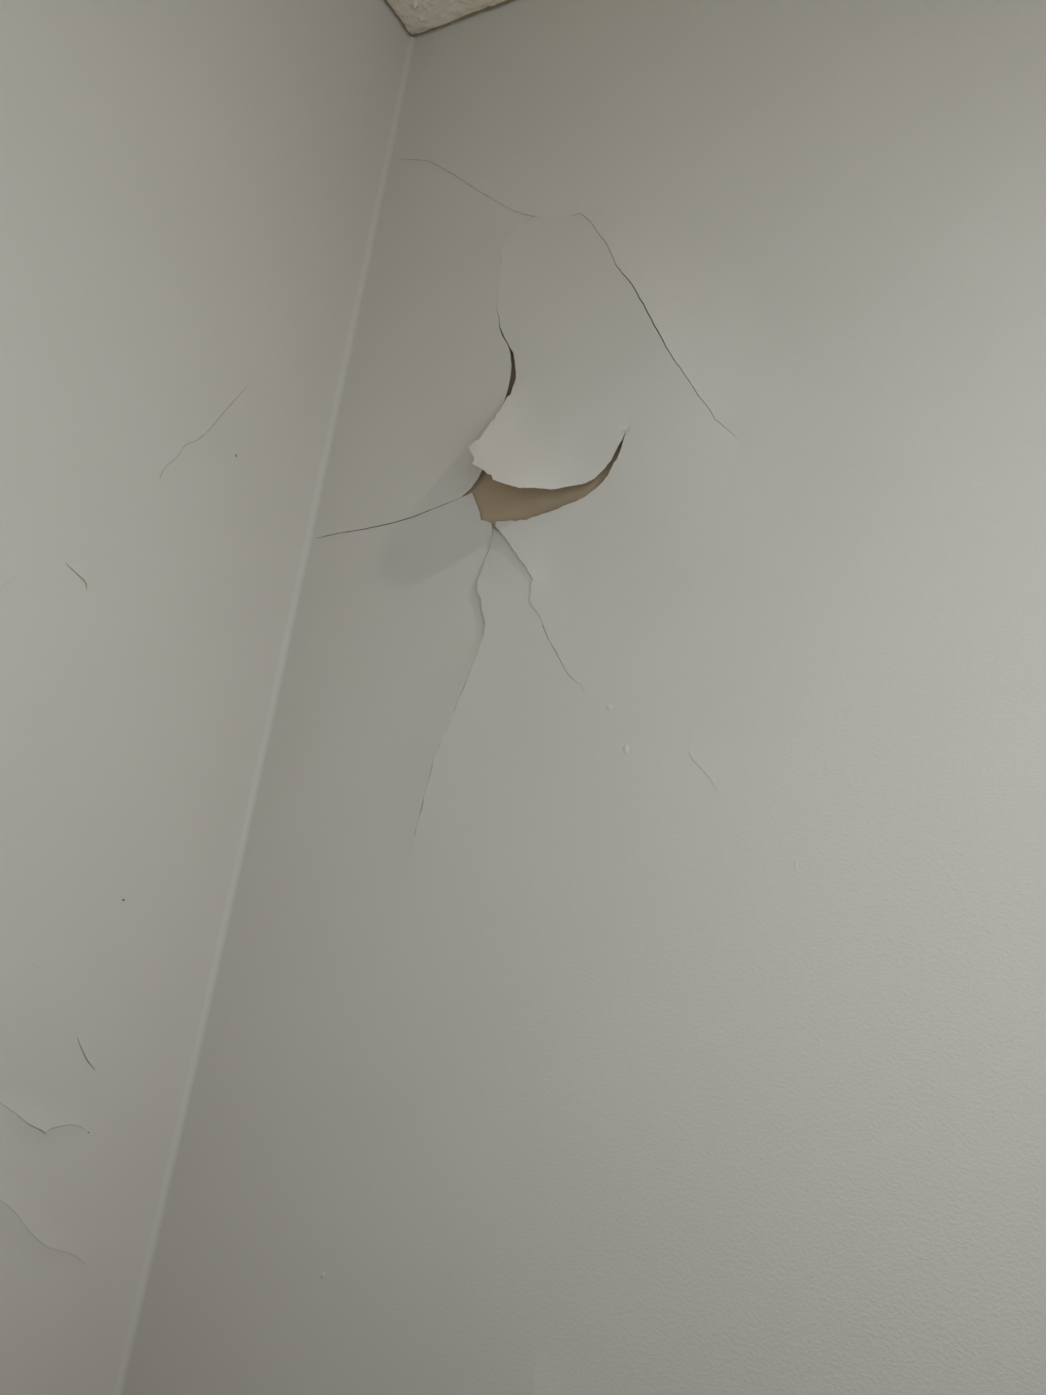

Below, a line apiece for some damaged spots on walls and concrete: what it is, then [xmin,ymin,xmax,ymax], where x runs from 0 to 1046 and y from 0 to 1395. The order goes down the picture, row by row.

peeling [317,159,840,949]